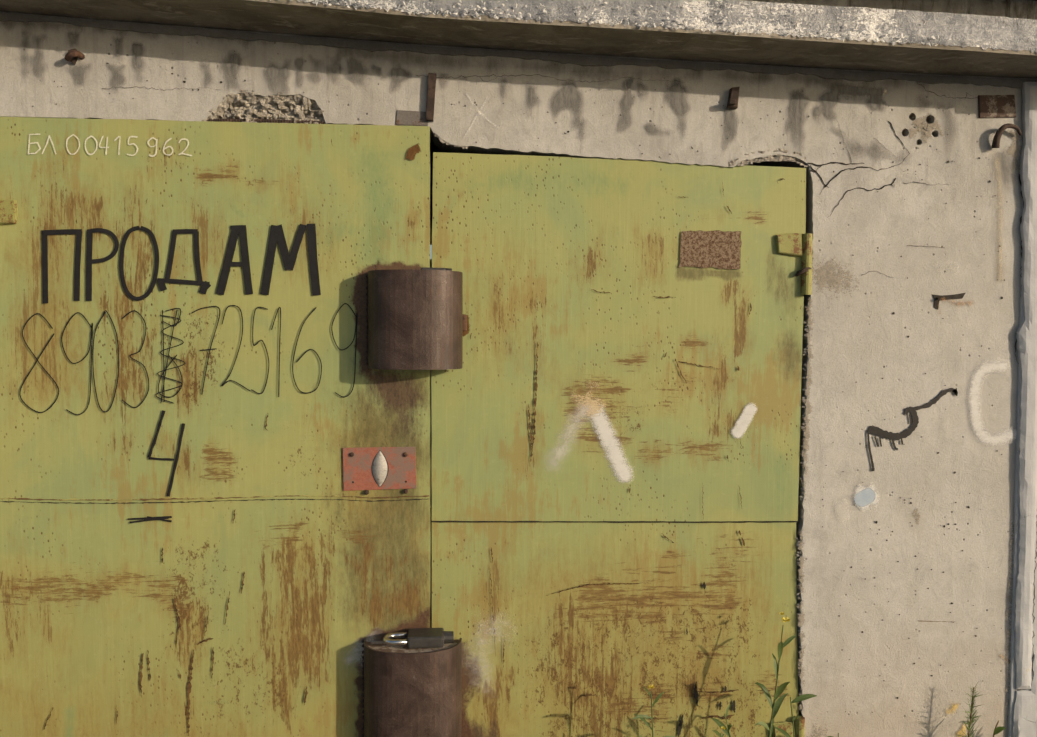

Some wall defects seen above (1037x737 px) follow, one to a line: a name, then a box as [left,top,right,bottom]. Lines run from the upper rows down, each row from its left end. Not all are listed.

water stain [109,30,143,86]
water stain [224,53,241,84]
water stain [265,59,319,91]
water stain [331,48,411,87]
spalling [202,78,328,124]
water stain [553,71,583,134]
water stain [620,79,644,126]
water stain [666,80,689,126]
water stain [726,109,738,141]
water stain [787,78,887,140]
crack [807,121,948,217]
rust [679,230,742,269]